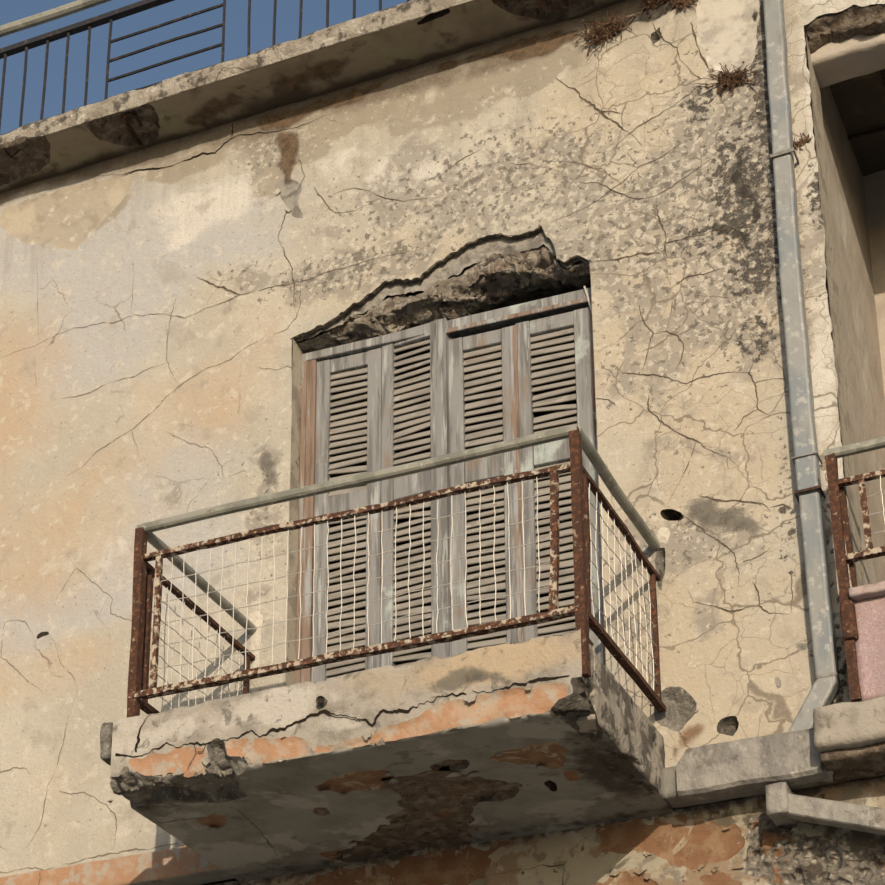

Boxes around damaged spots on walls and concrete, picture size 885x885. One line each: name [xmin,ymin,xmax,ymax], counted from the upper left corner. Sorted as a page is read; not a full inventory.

spalling [804,4,885,54]
crack [102,115,325,176]
leakage [258,82,381,183]
leakage [711,223,747,245]
leakage [731,154,761,223]
crack [4,159,449,469]
spalling [297,246,591,354]
crack [512,17,793,614]
leakage [690,500,756,529]
crack [115,675,569,770]
peeling [107,677,604,808]
peeling [594,812,885,885]